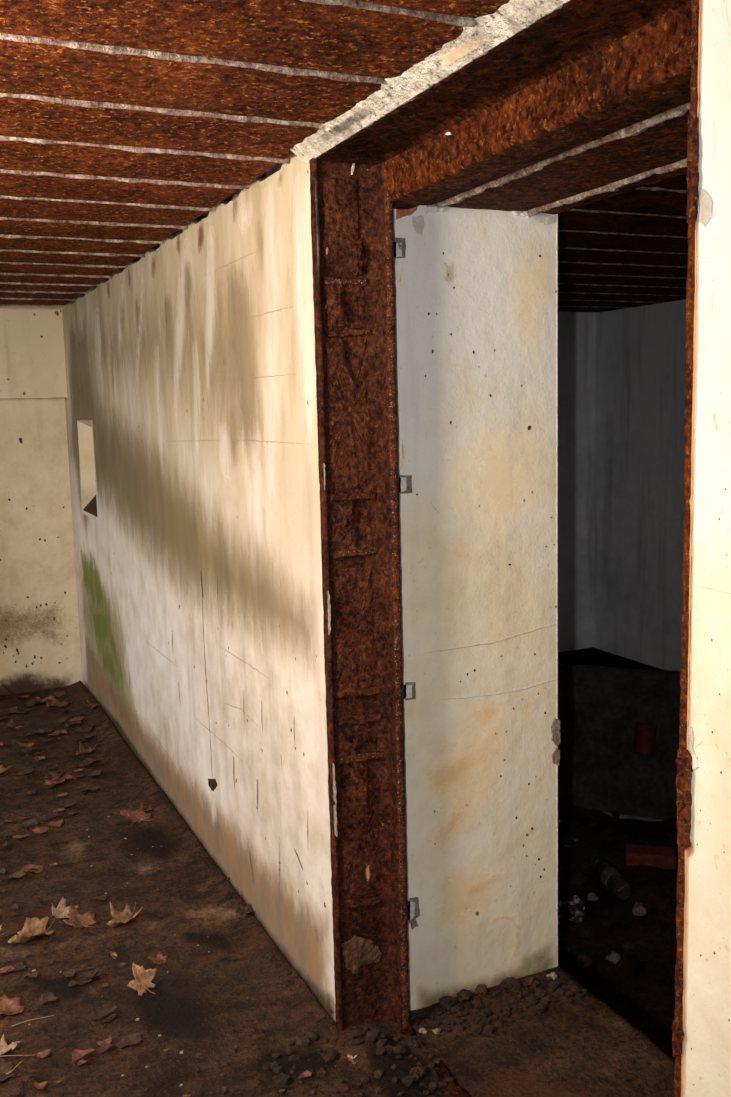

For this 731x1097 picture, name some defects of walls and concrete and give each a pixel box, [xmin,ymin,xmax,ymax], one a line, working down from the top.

leakage [70,291,310,652]
leakage [136,235,254,474]
leakage [296,193,313,340]
leakage [81,550,127,706]